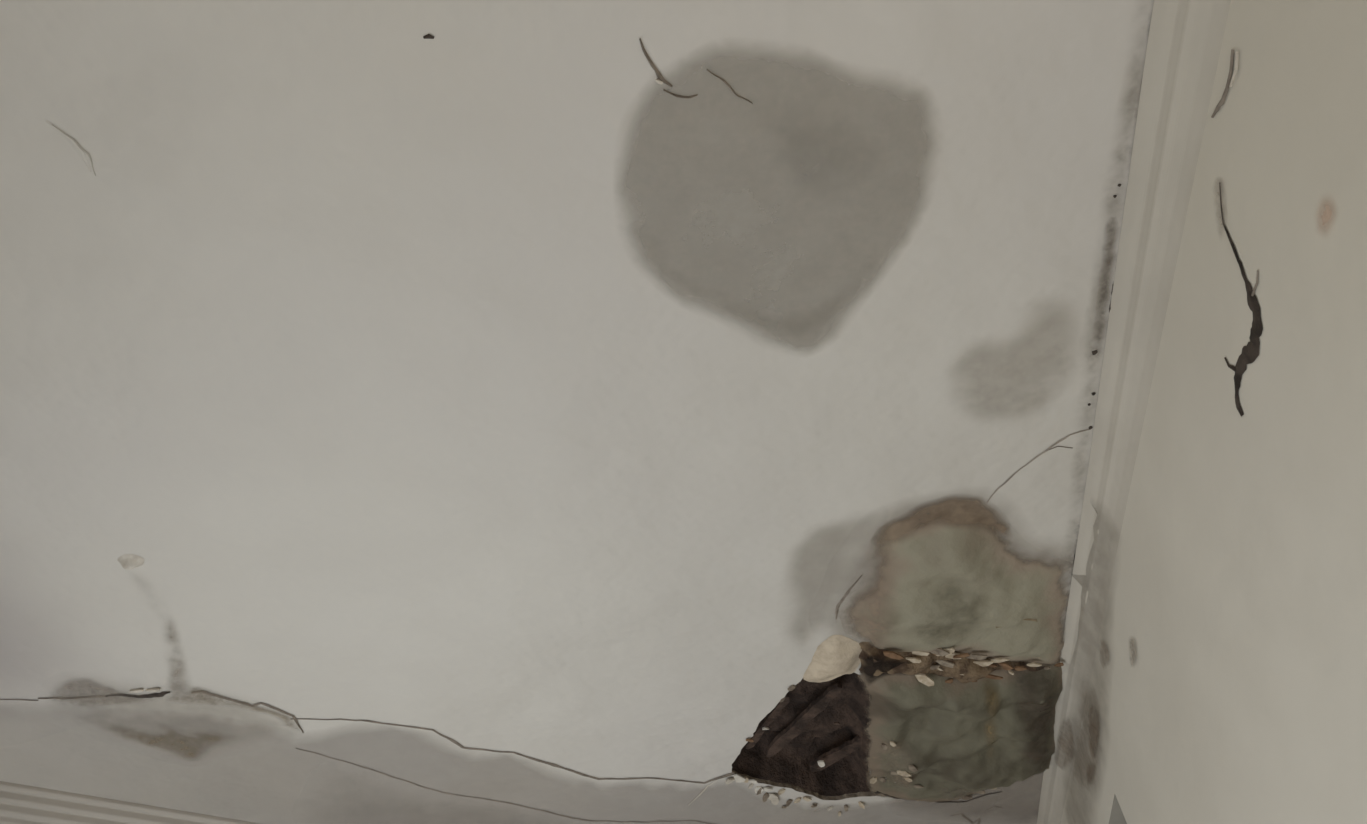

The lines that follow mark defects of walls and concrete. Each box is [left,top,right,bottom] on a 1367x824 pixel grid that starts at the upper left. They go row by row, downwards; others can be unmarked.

water stain [626,57,926,347]
crack [1218,182,1263,416]
spalling [726,635,1064,802]